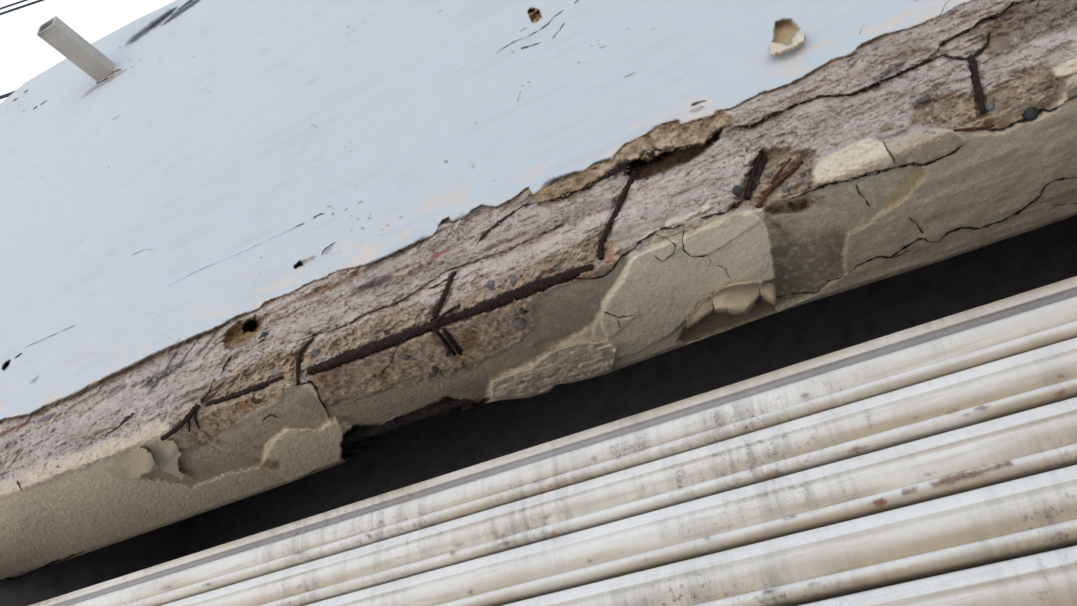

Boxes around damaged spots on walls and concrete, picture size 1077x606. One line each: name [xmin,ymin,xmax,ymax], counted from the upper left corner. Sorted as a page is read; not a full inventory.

crack [738,0,1034,128]
crack [791,95,1077,207]
crack [288,144,696,344]
spalling [104,0,1077,488]
crack [574,199,745,280]
crack [776,177,1077,298]